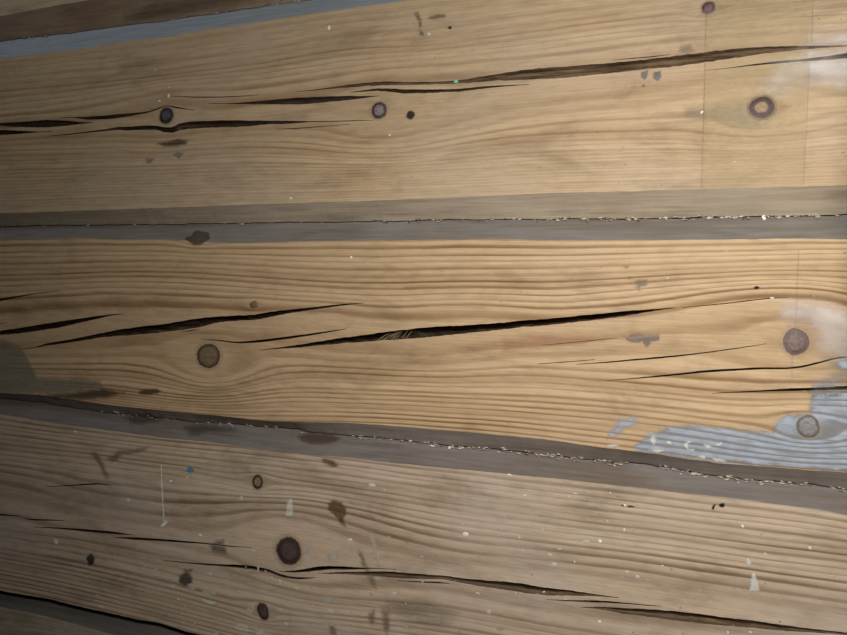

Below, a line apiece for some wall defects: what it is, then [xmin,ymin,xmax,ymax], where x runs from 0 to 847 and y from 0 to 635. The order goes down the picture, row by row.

crack [0,45,847,136]
crack [0,291,57,301]
crack [0,297,847,393]
crack [0,514,847,635]